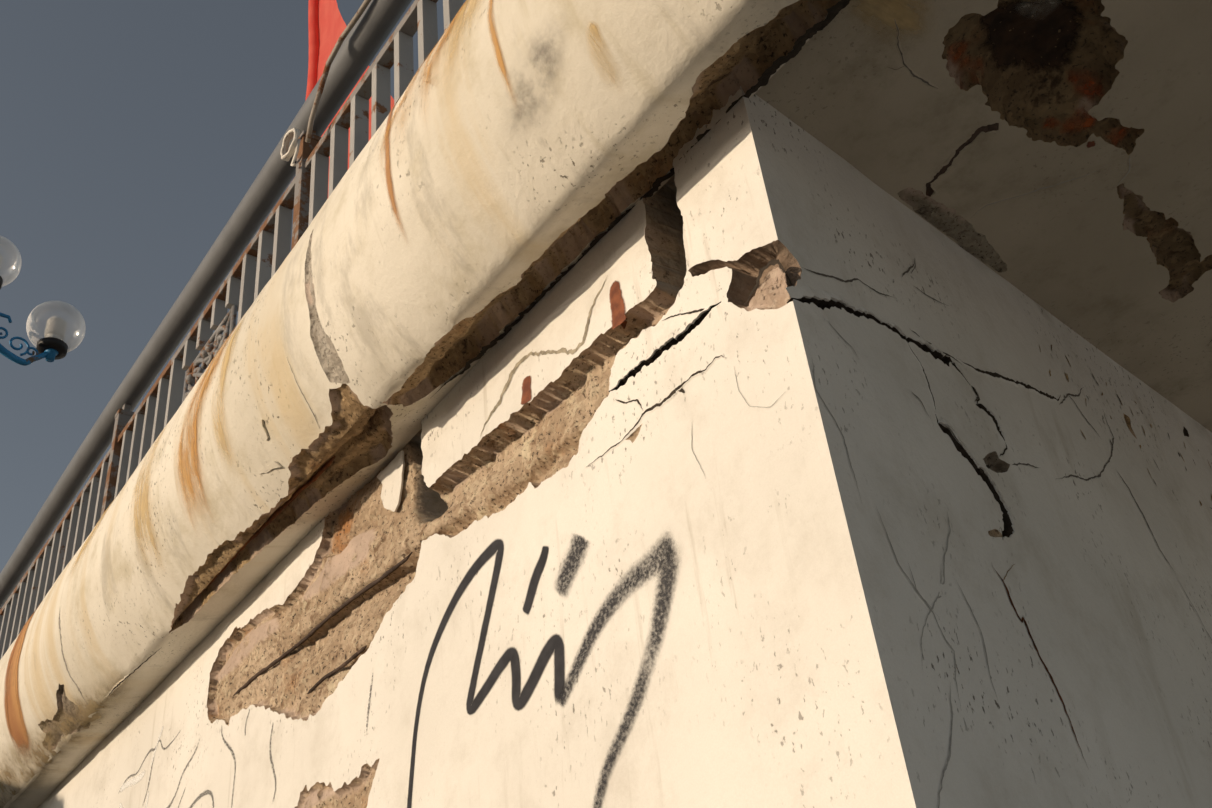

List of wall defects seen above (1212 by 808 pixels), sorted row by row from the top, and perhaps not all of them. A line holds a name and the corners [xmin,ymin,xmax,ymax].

corrosion [421,0,509,85]
spalling [942,0,1144,155]
corrosion [385,96,404,221]
crack [434,0,851,438]
crack [922,118,999,198]
spalling [1117,184,1212,303]
corrosion [179,321,242,500]
spalling [169,0,841,726]
crack [586,295,785,468]
crack [786,263,1212,808]
corrosion [5,603,41,749]
spalling [295,758,380,808]